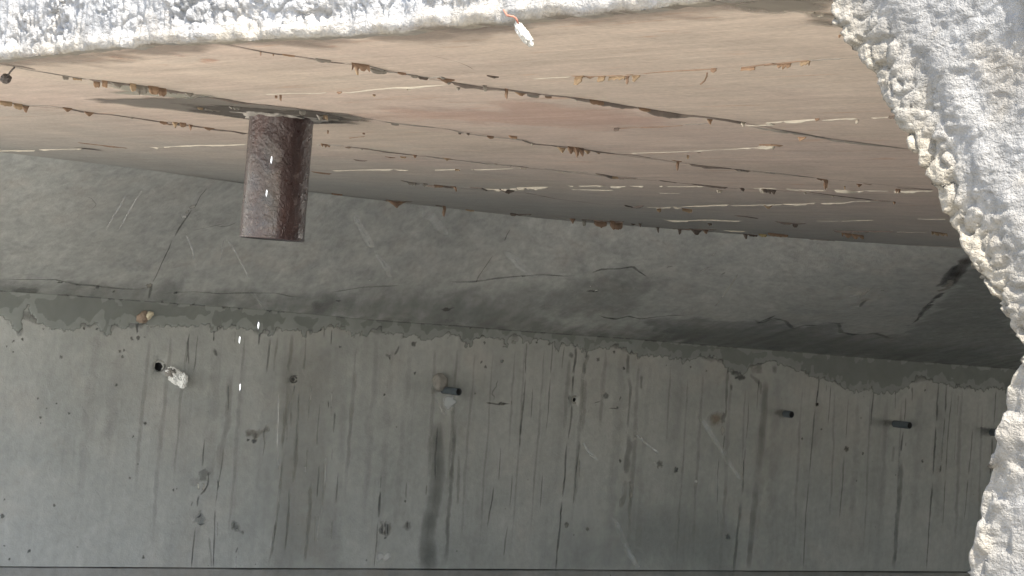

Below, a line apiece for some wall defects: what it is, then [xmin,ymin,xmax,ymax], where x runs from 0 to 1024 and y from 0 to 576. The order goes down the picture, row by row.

crack [914,259,971,322]